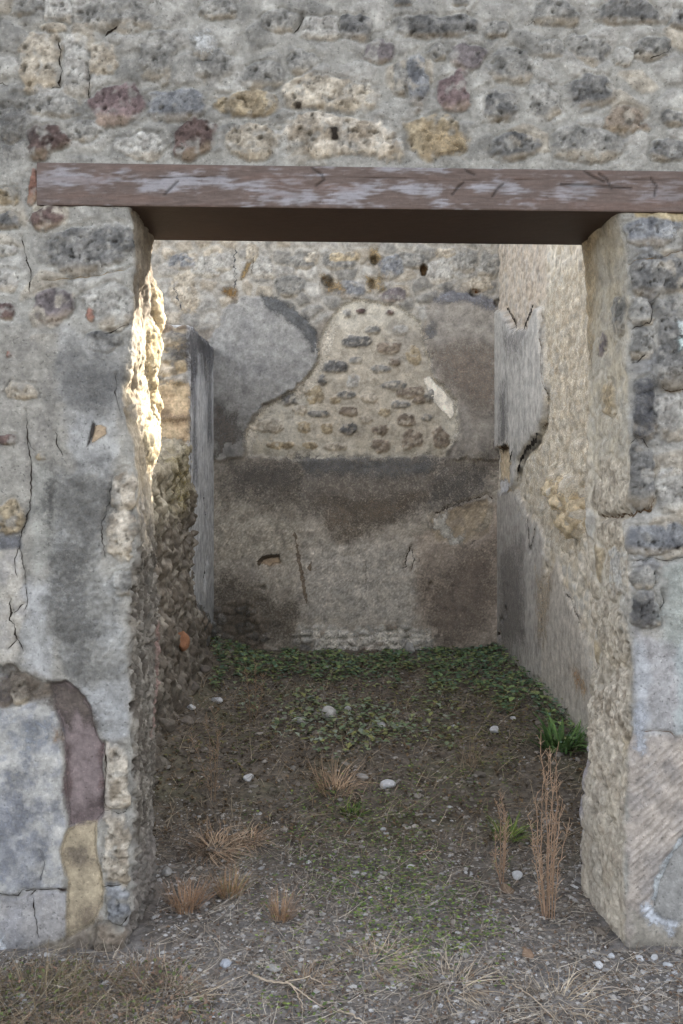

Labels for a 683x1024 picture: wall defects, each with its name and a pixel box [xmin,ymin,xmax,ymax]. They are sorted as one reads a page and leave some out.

crack [8,418,63,649]
spalling [257,554,280,566]
leakage [173,321,522,544]
spalling [244,299,459,462]
spalling [499,443,512,493]
flaking render [0,665,105,937]
crack [0,854,56,937]